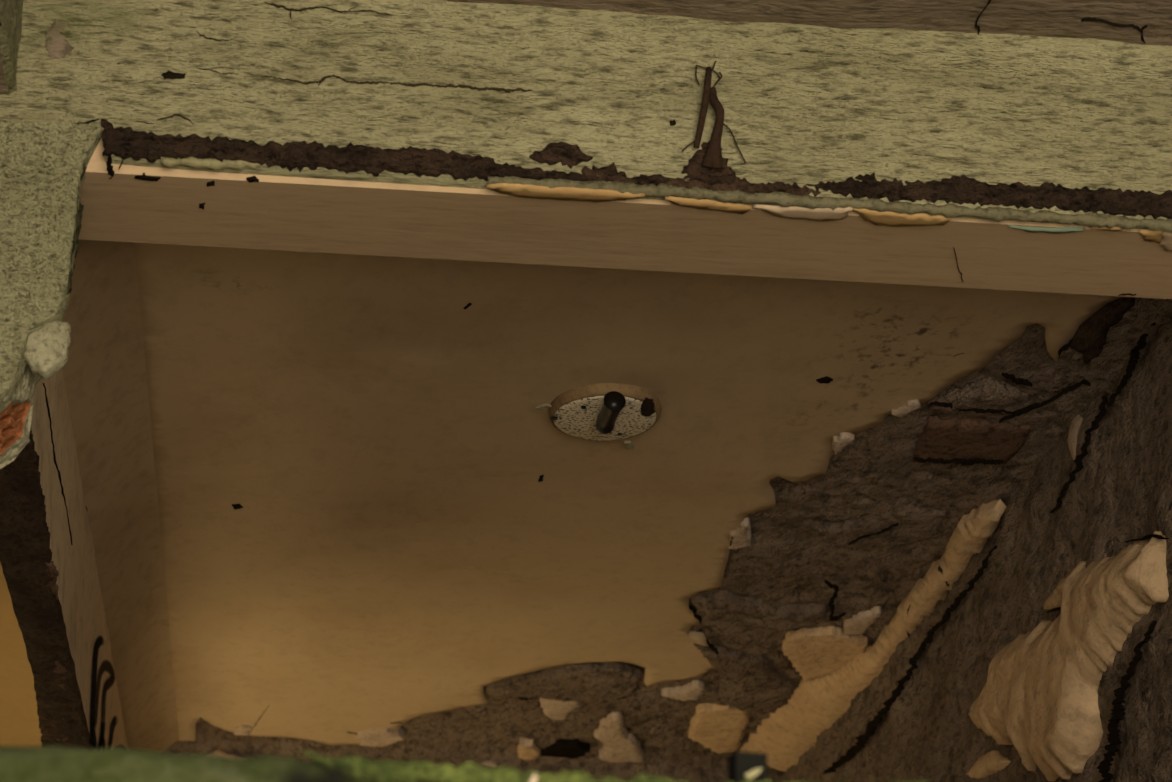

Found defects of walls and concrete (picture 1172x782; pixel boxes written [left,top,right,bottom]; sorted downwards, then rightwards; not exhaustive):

spalling [61,155,87,302]
peeling [134,173,161,181]
spalling [0,320,81,748]
crack [43,383,88,545]
flaking render [355,297,1172,782]
flaking render [195,717,311,758]